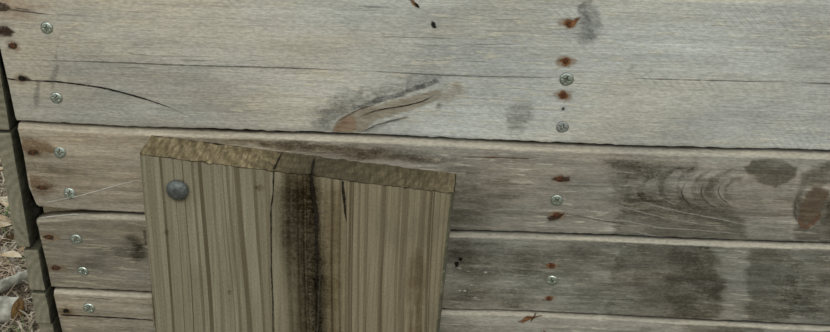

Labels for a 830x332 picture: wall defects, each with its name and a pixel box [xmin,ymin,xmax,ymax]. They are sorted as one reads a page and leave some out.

crack [270,153,282,332]
leakage [283,180,321,332]